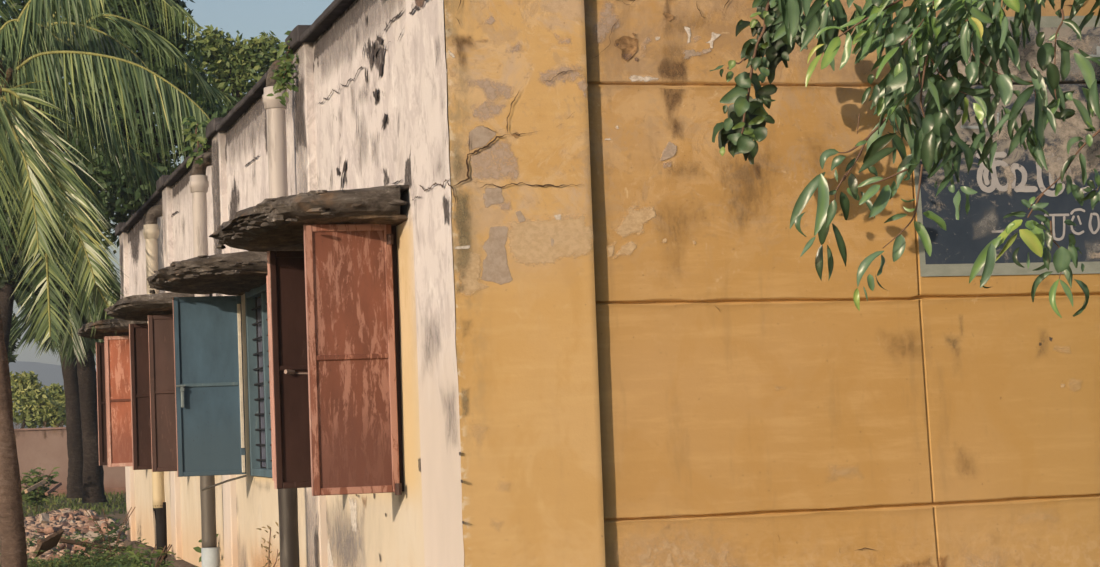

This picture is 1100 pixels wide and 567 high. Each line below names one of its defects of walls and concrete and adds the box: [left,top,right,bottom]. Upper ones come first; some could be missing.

water stain [119,167,192,298]
water stain [206,96,267,255]
water stain [285,74,347,193]
crack [318,66,363,104]
water stain [313,0,393,151]
crack [383,0,427,50]
crack [392,0,635,209]
peeling [455,80,592,295]
flaking render [596,3,660,61]
peeling [608,206,655,256]
peeling [684,27,721,59]
water stain [307,501,361,567]